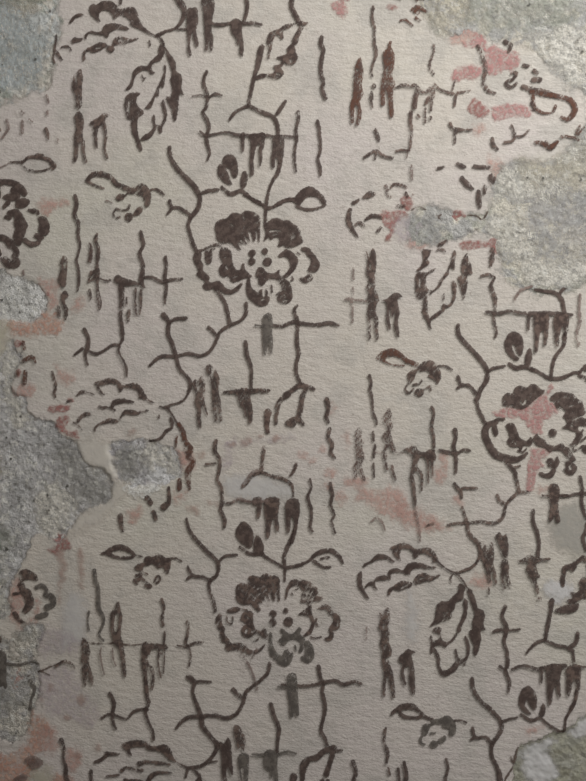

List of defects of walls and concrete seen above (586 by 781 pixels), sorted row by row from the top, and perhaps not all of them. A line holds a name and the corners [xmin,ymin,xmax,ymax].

flaking render [420,0,586,95]
flaking render [381,125,586,297]
flaking render [0,269,48,324]
flaking render [0,339,195,619]
flaking render [0,622,46,744]
flaking render [512,715,586,781]